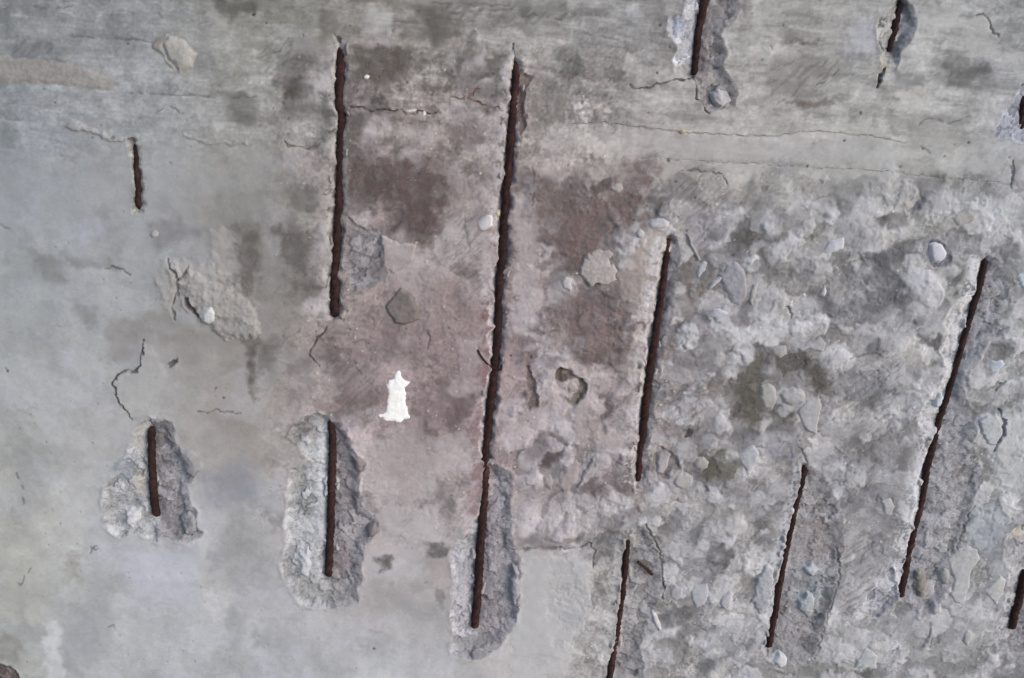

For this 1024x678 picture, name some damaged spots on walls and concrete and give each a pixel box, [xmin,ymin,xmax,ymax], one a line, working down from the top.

peeling [562,246,618,291]
spalling [924,238,953,268]
crack [111,339,145,418]
spalling [100,416,204,544]
spalling [281,410,381,610]
spalling [449,56,535,661]
spalling [555,367,589,406]
spalling [605,524,663,678]
spalling [631,218,759,503]
spalling [751,462,846,668]
spalling [862,254,1015,660]
spalling [984,524,1024,653]